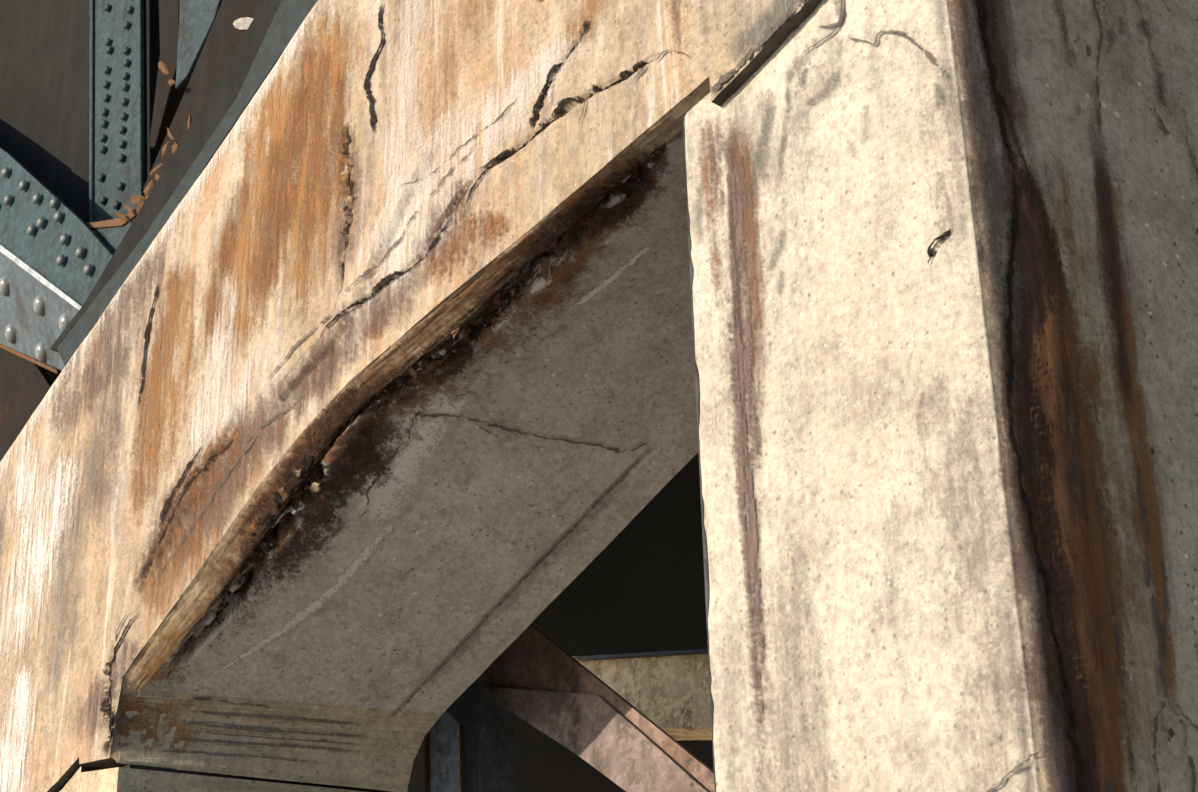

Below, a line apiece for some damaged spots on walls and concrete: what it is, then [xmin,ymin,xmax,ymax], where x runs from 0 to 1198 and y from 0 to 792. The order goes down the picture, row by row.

crack [138,283,159,407]
crack [100,396,302,752]
water stain [150,45,561,573]
water stain [205,366,525,679]
corrosion [116,9,633,752]
crack [289,411,646,571]
crack [269,4,689,377]
water stain [525,254,569,295]
water stain [575,242,654,306]
corrosion [699,124,764,731]
crack [804,0,1093,792]
corrosion [1010,120,1176,792]